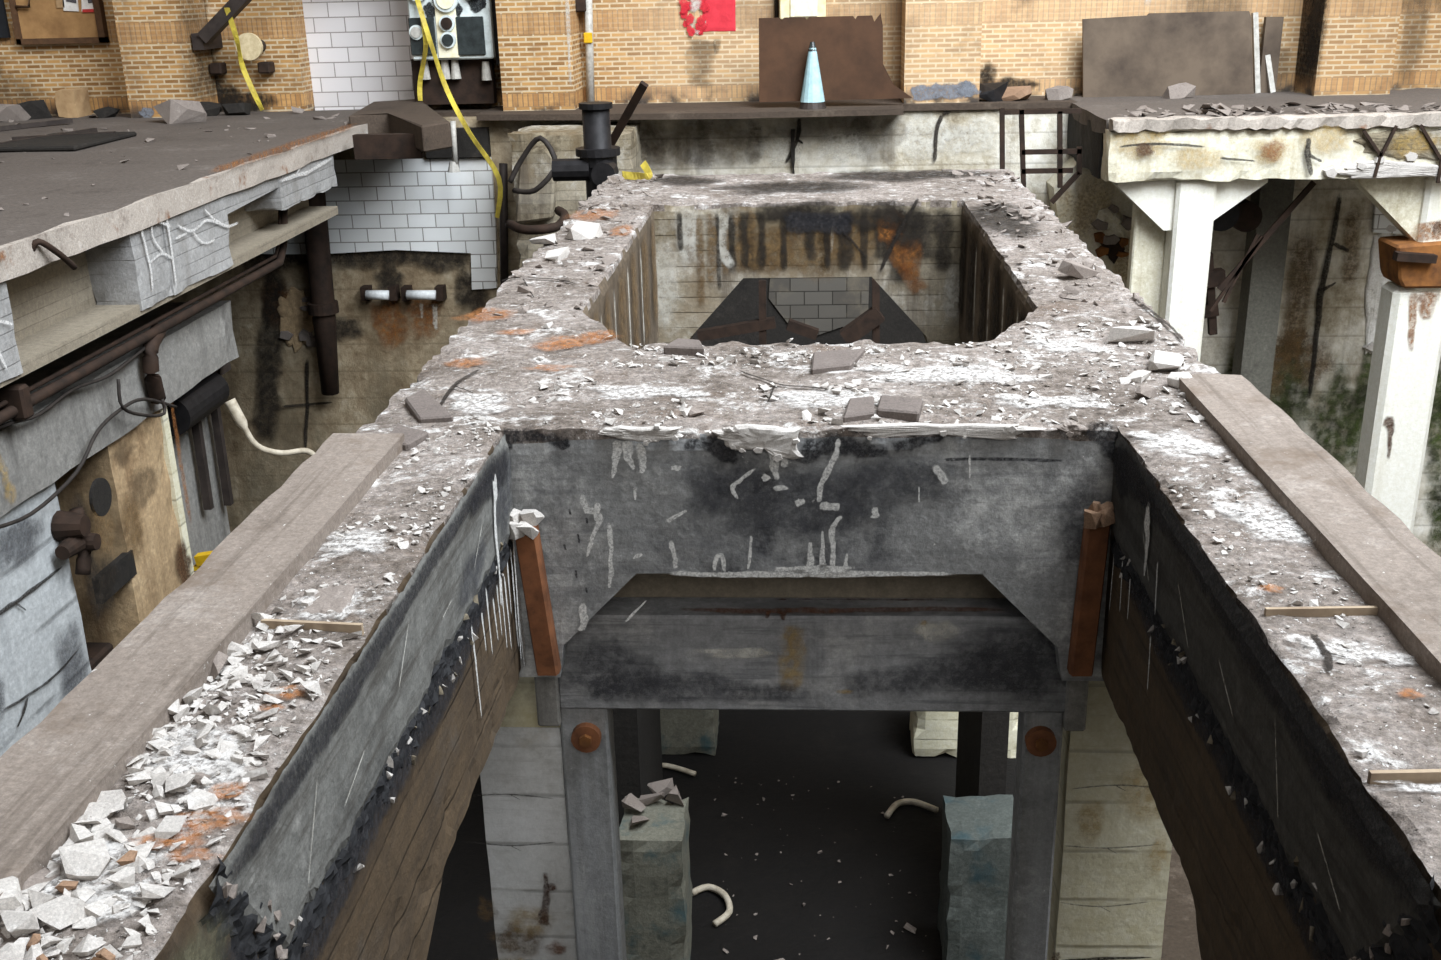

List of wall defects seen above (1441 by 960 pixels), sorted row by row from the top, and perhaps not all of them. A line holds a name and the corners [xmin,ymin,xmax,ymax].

spalling [1322,124,1441,183]
water stain [595,211,1025,349]
corrosion [879,216,924,290]
corrosion [1416,221,1441,240]
corrosion [1409,292,1437,349]
spalling [598,424,683,446]
spalling [705,424,803,462]
spalling [841,422,1088,440]
water stain [669,439,951,578]
water stain [580,495,614,588]
water stain [578,603,589,631]